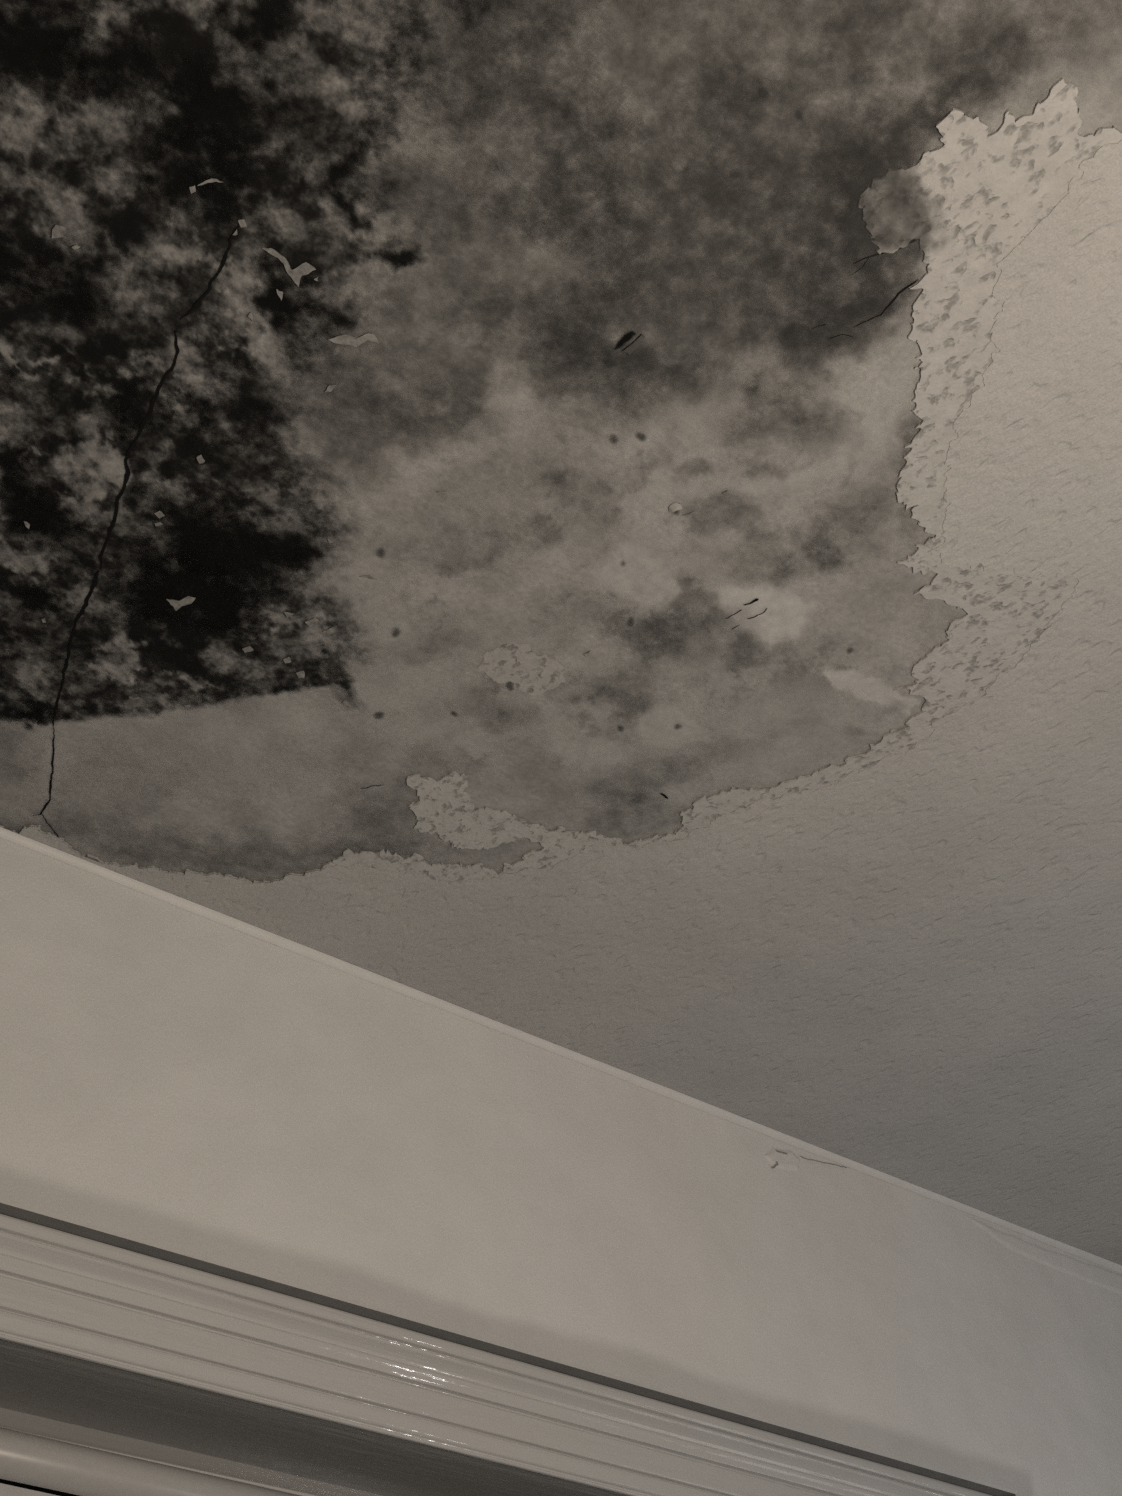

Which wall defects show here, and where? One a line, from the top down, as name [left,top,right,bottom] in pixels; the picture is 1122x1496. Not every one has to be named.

crack [33,218,242,838]
water stain [0,0,435,729]
peeling [0,0,1122,883]
water stain [575,114,937,398]
water stain [700,0,813,150]